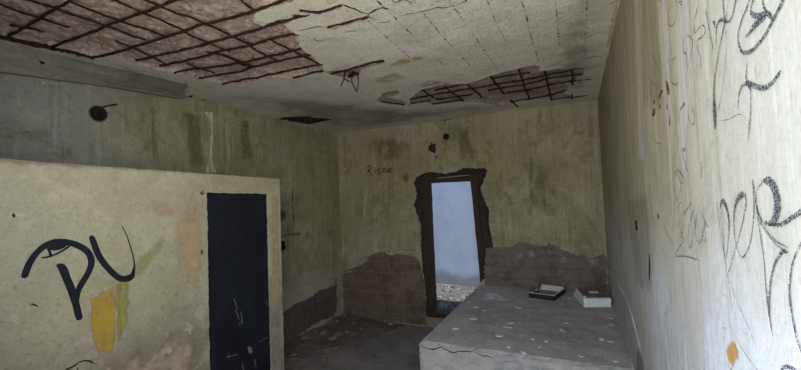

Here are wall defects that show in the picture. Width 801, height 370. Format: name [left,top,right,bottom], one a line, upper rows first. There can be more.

spalling [0,0,385,92]
spalling [377,65,591,108]
flaking render [652,81,671,126]
flaking render [270,168,649,370]
crack [424,347,493,358]